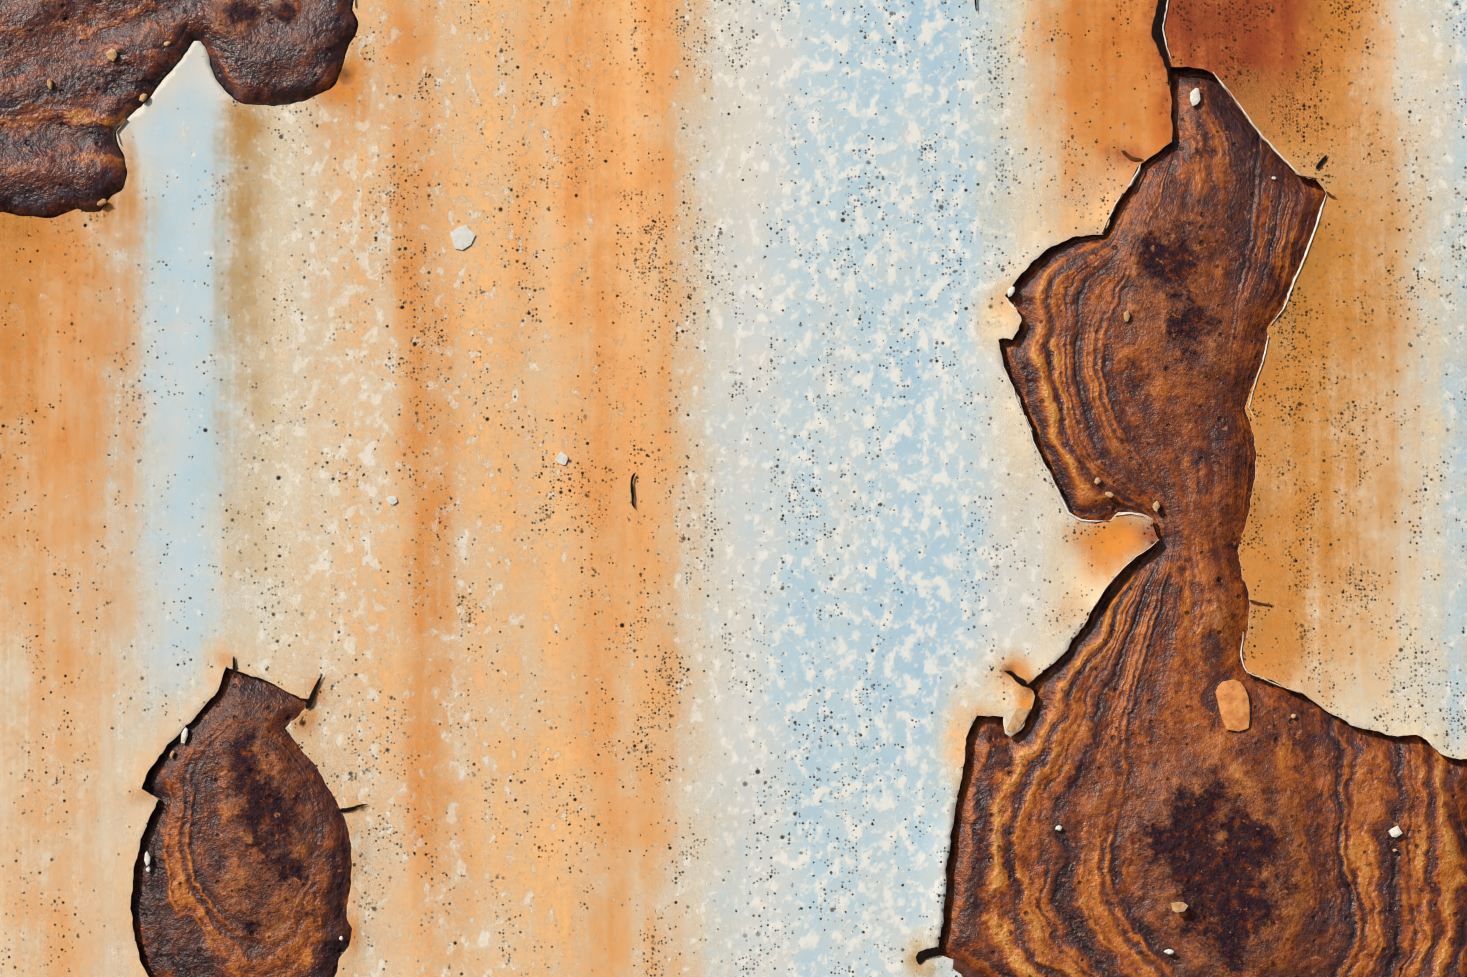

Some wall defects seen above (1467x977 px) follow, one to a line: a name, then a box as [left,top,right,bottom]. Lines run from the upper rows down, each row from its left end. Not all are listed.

peeling [0,0,358,218]
crack [1151,0,1172,85]
corrosion [0,169,166,977]
corrosion [207,0,705,977]
corrosion [978,268,1027,348]
corrosion [941,516,1158,783]
peeling [938,67,1467,977]
corrosion [1004,0,1467,759]
peeling [131,667,352,977]